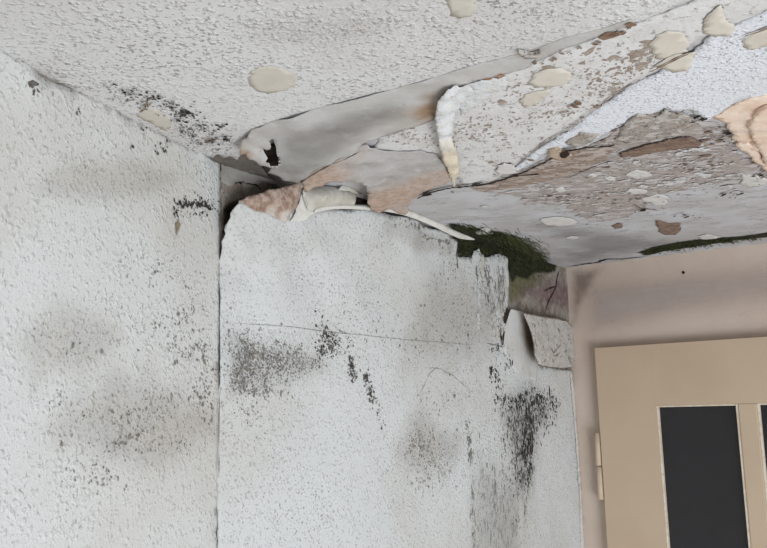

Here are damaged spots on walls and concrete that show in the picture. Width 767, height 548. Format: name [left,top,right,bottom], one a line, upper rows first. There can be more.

leakage [85,81,235,155]
peeling [248,66,297,94]
peeling [373,116,448,171]
peeling [445,0,767,229]
leakage [173,195,239,233]
flaking render [220,164,289,234]
leakage [395,218,460,294]
peeling [655,213,702,235]
leakage [89,250,386,503]
leakage [487,336,568,499]